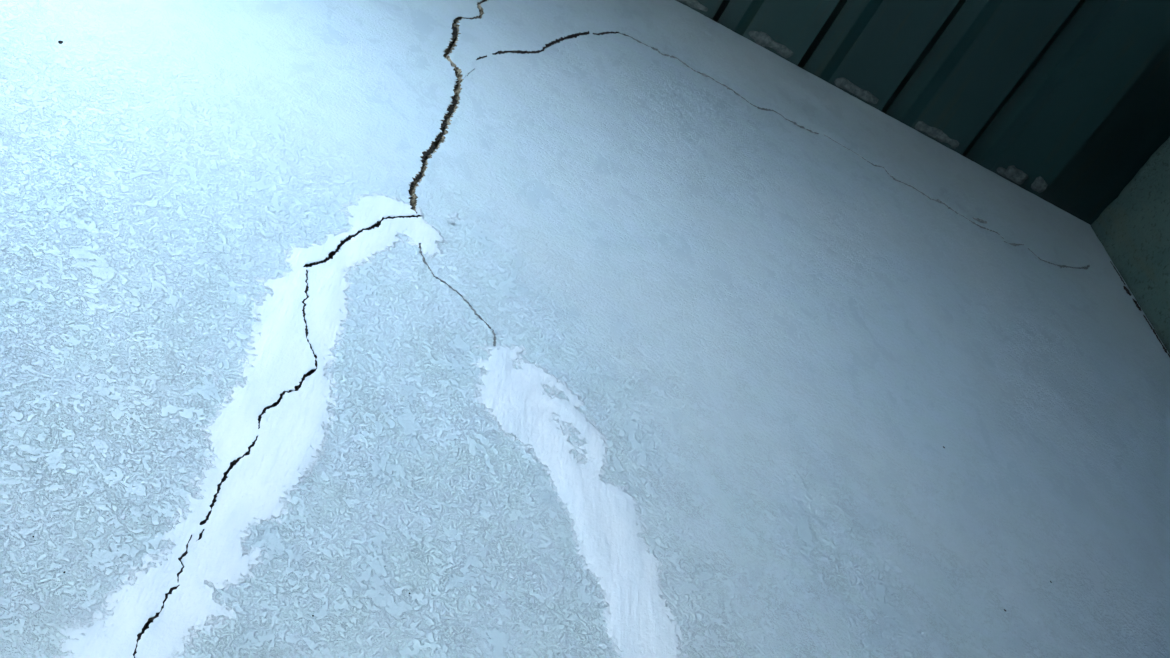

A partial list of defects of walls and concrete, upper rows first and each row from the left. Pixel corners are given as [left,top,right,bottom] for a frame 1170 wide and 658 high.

crack [133,0,496,658]
crack [477,31,1090,269]